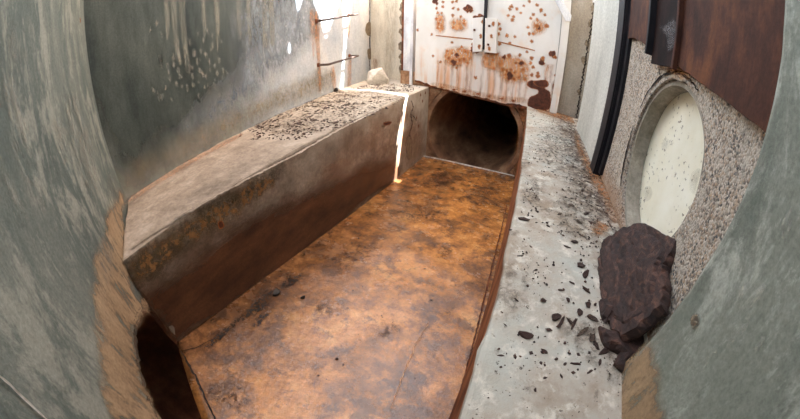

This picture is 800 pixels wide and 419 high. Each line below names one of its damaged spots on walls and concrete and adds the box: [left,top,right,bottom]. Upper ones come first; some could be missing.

leakage [84,0,403,178]
rust [431,0,557,83]
peeling [93,110,378,419]